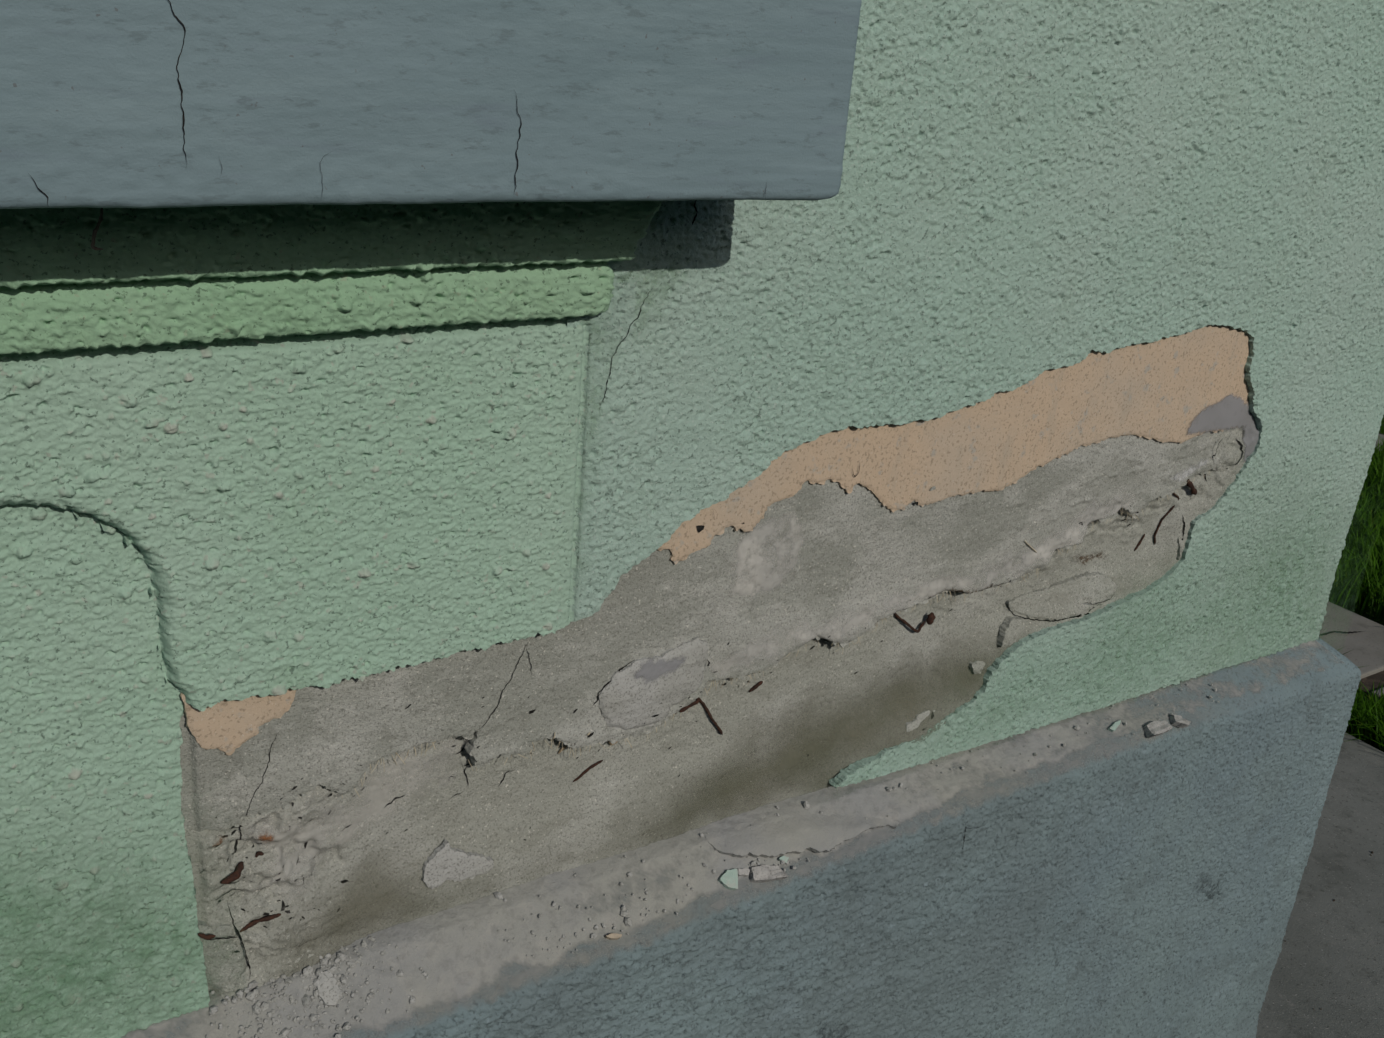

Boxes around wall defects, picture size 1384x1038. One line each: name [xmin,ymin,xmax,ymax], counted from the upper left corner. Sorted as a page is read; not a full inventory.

crack [168,0,222,173]
crack [514,92,522,192]
crack [234,731,280,853]
crack [449,640,532,796]
flaking render [179,325,1250,998]
crack [210,901,251,979]